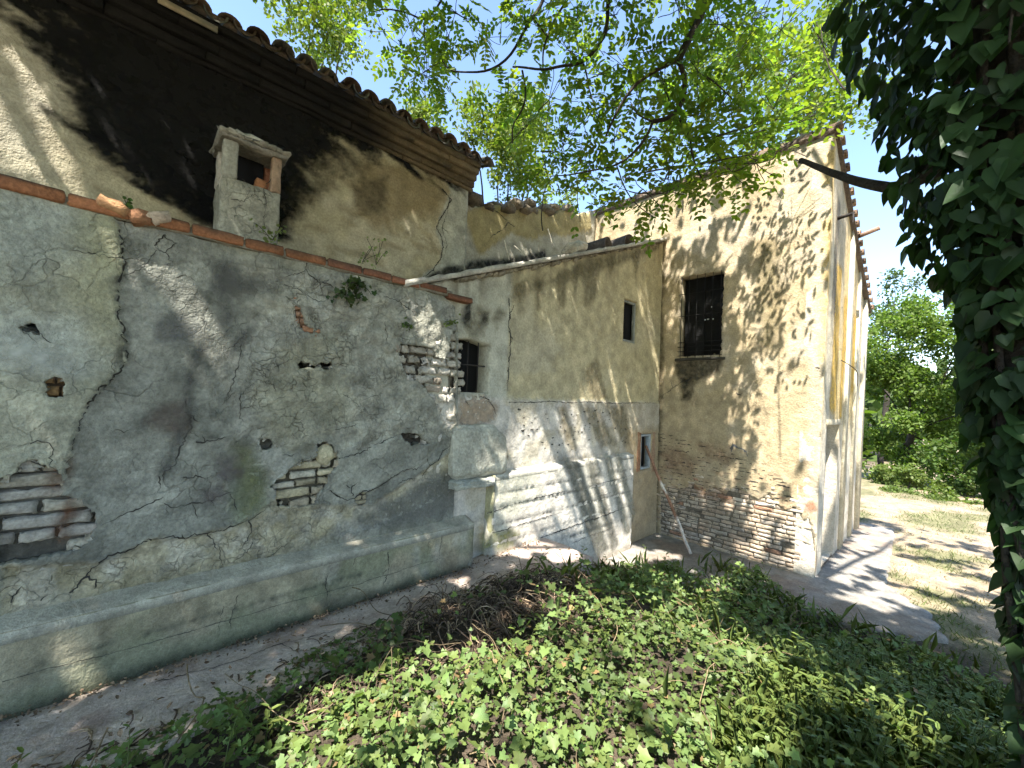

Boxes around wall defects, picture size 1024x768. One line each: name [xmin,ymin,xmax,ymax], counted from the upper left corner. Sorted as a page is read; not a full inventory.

crack [74,234,214,321]
spalling [294,297,320,337]
crack [284,263,335,302]
leakage [830,201,857,417]
spalling [0,229,129,571]
spalling [396,332,495,446]
crack [10,333,292,603]
spalling [271,442,339,507]
crack [330,448,448,501]
flaking render [656,434,817,573]